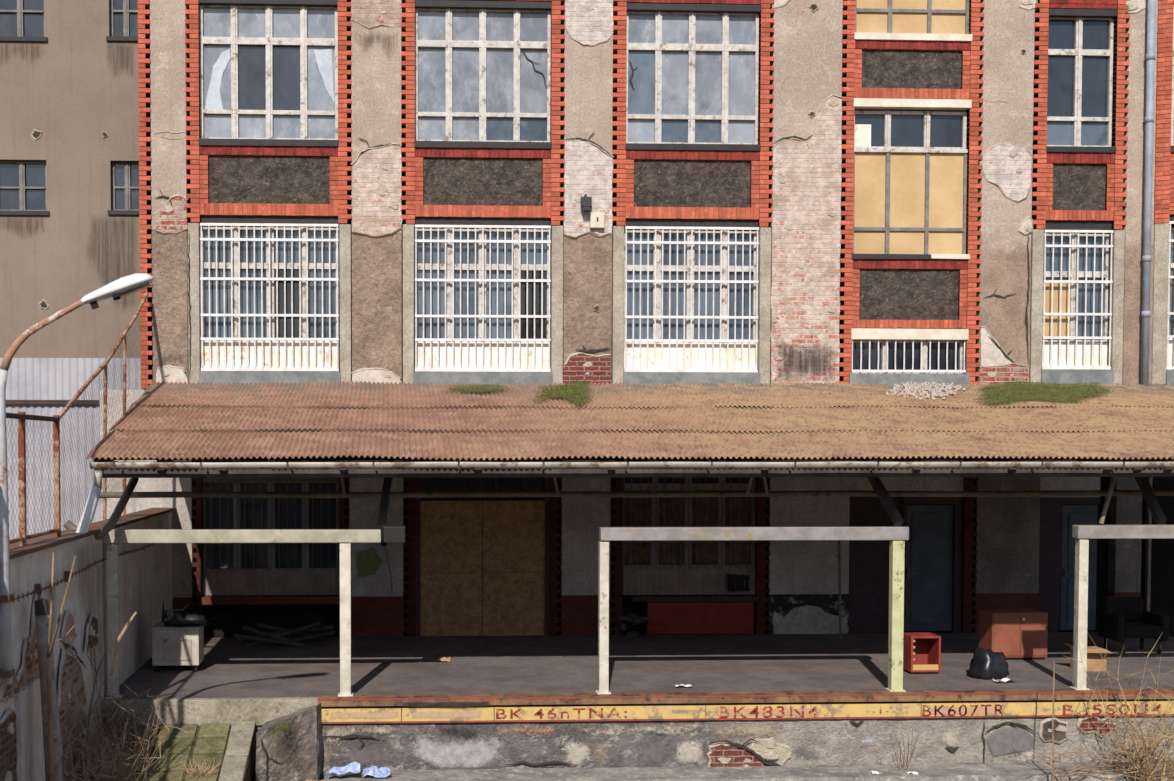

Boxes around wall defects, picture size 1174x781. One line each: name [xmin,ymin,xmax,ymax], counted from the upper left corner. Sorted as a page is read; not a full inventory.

crack [774,135,813,143]
flaking render [153,194,188,235]
flaking render [351,143,403,238]
flaking render [563,139,614,239]
flaking render [770,94,843,384]
flaking render [563,352,612,384]
leakage [780,347,827,373]
flaking render [978,326,1029,385]
peeling [772,605,848,634]
flaking render [0,593,43,781]
flaking render [57,610,99,781]
spalling [707,709,820,767]